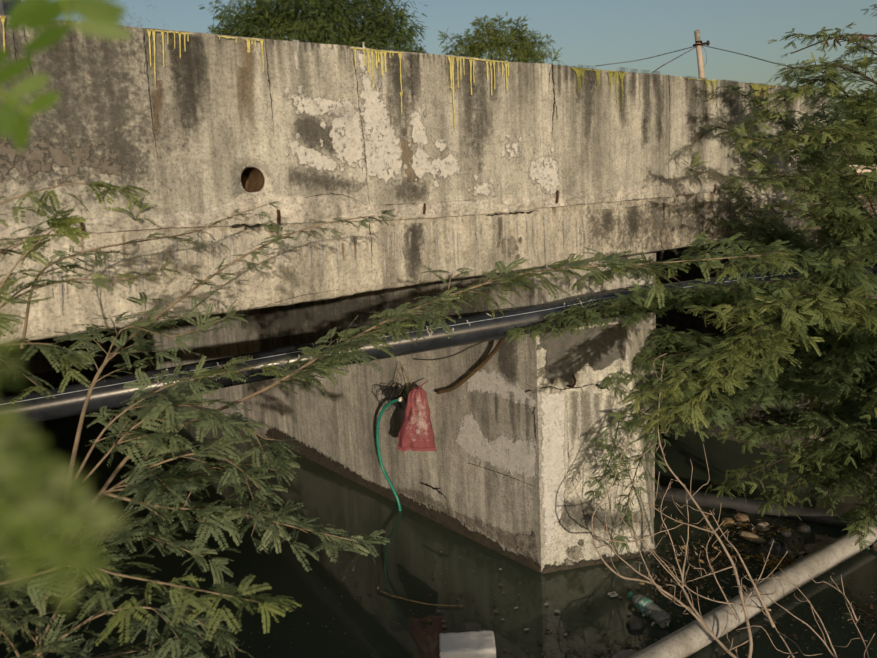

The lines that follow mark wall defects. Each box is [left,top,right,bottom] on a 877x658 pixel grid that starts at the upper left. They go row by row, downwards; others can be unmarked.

crack [143,32,157,153]
crack [265,37,274,130]
crack [304,50,373,274]
peeling [284,42,463,189]
water stain [346,46,428,116]
peeling [468,175,495,197]
peeling [501,134,562,202]
crack [549,63,557,137]
water stain [558,65,663,142]
peeling [265,323,658,574]